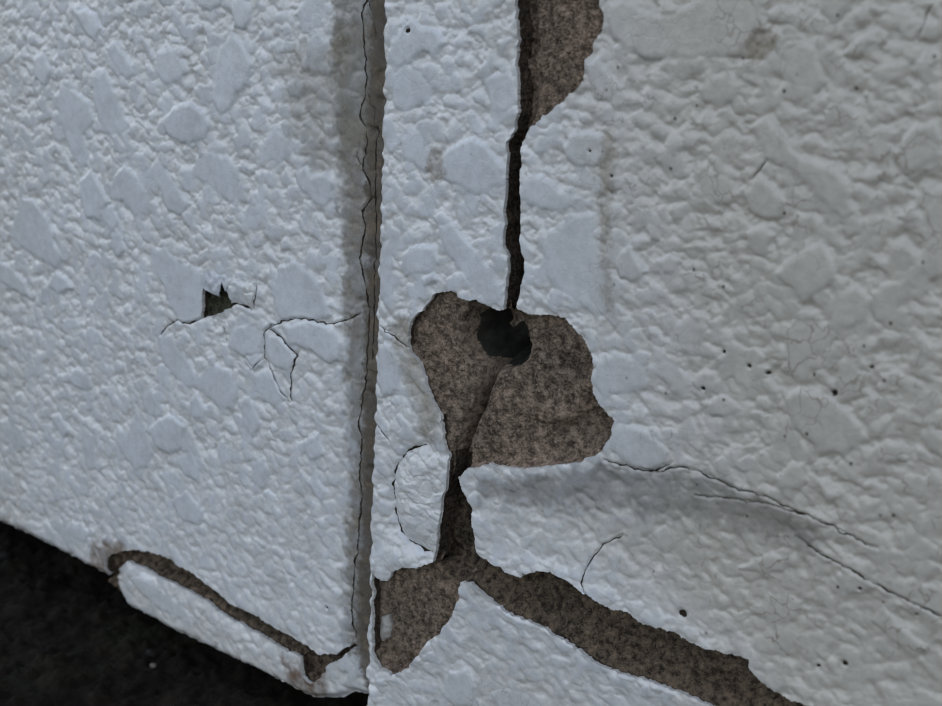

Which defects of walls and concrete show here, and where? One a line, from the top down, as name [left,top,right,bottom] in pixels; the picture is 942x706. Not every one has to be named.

spalling [509,0,604,148]
peeling [202,270,256,318]
crack [107,0,409,682]
spalling [410,291,614,482]
crack [505,128,530,327]
spalling [374,551,460,674]
crack [392,444,806,706]
crack [607,460,942,617]